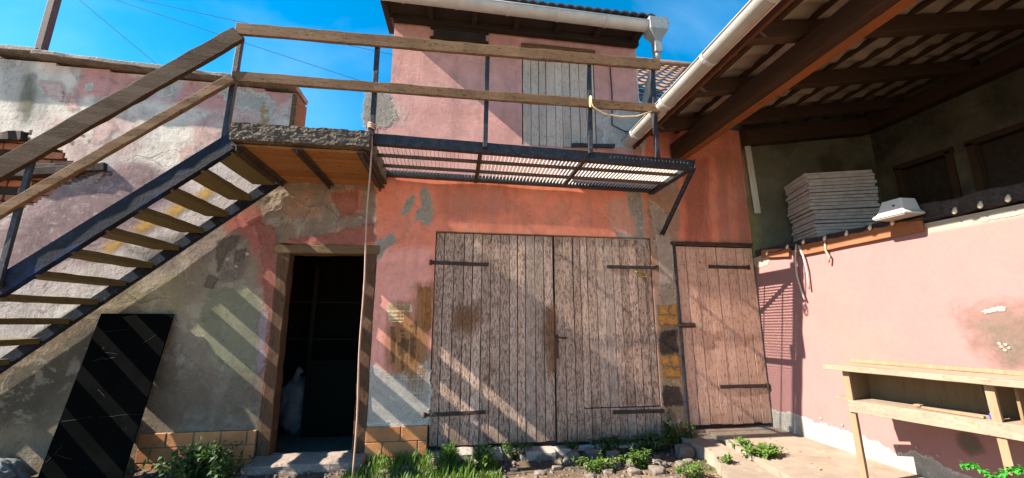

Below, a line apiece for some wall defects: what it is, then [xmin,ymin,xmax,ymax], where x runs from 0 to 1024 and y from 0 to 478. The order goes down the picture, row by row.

spalling [0,130,31,150]
peeling [40,80,79,110]
peeling [81,121,117,143]
peeling [180,114,224,162]
peeling [361,92,398,128]
spalling [0,150,110,208]
peeling [291,186,434,262]
peeling [202,205,278,392]
peeling [367,361,433,426]